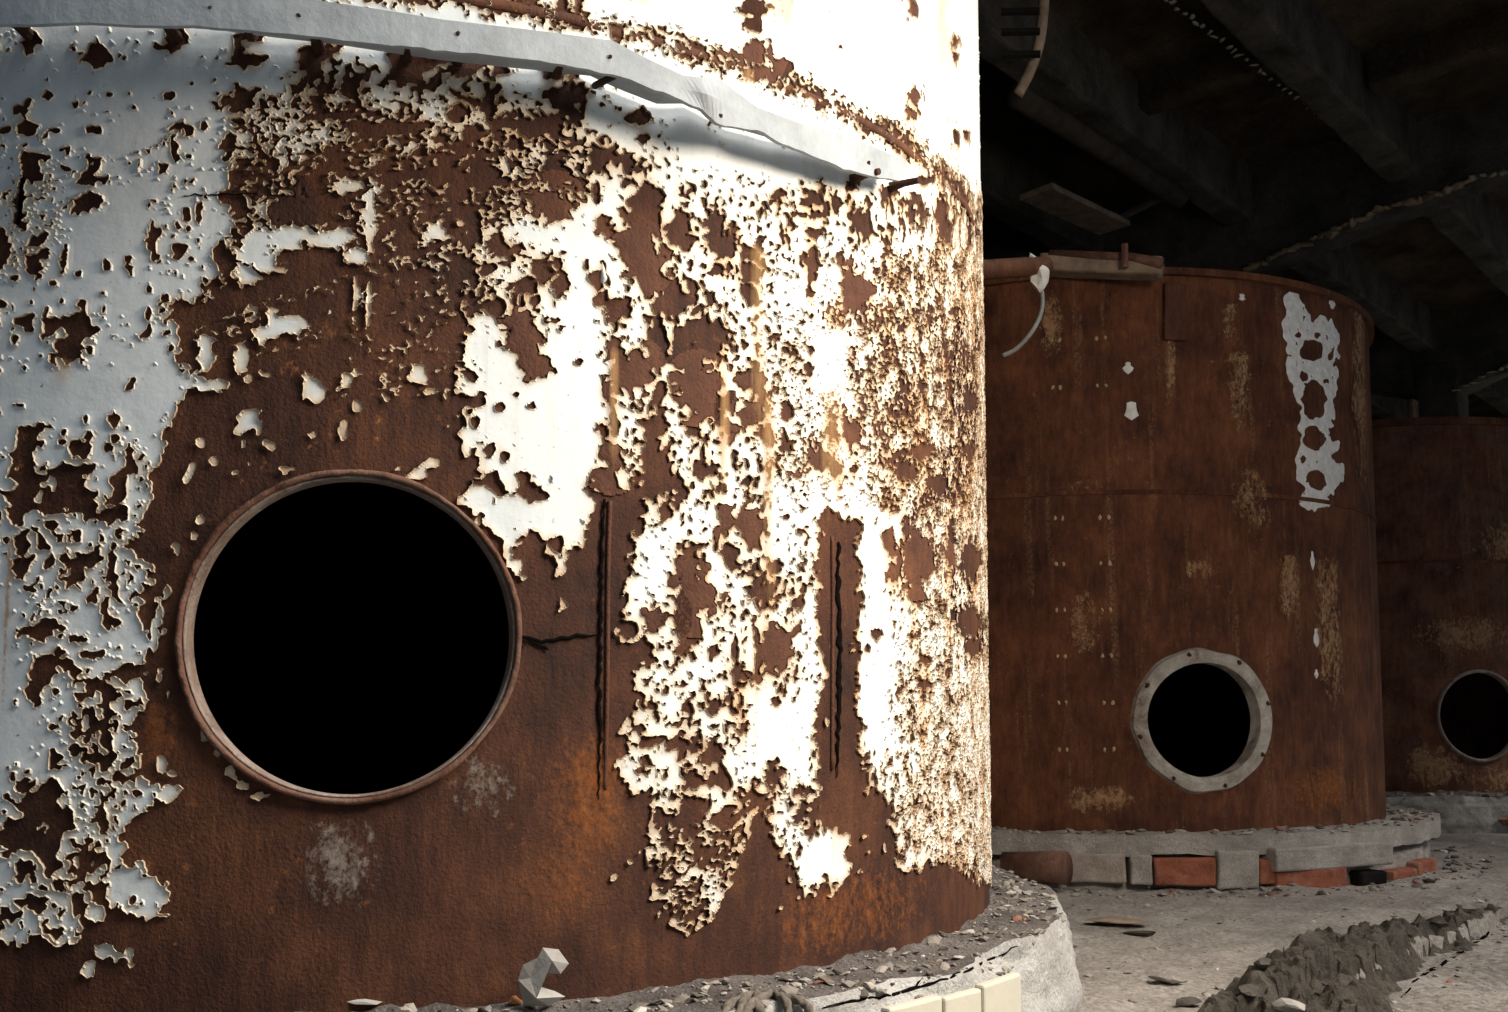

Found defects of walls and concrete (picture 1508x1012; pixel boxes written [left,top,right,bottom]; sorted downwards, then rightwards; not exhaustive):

rust [715,0,788,87]
rust [612,220,678,298]
rust [496,306,553,382]
rust [601,336,778,446]
peeling [1282,292,1344,512]
peeling [0,0,992,978]
crack [522,499,609,799]
rust [640,558,729,651]
rust [714,489,769,551]
rust [744,615,801,684]
crack [835,541,843,777]
rust [882,519,958,602]